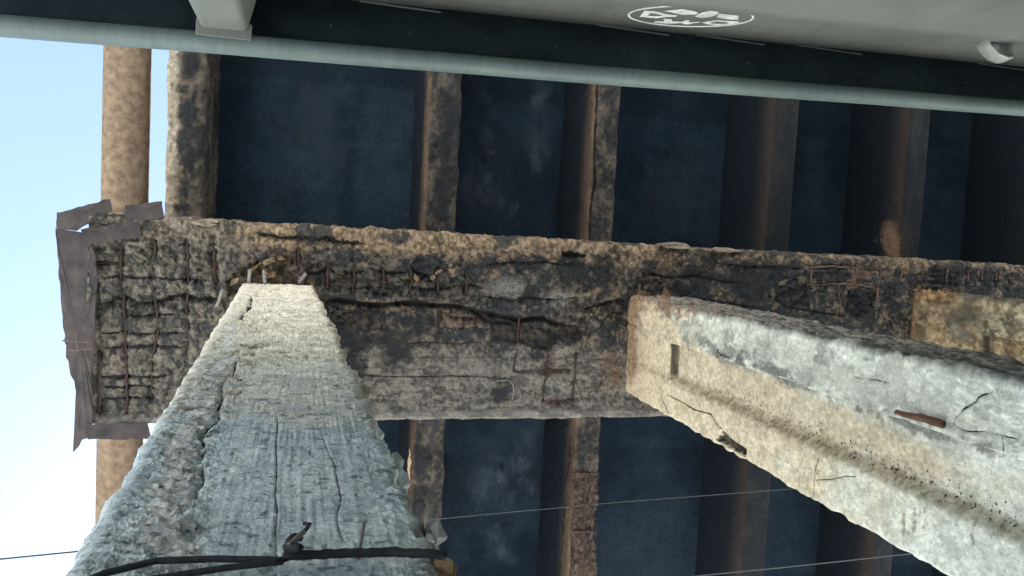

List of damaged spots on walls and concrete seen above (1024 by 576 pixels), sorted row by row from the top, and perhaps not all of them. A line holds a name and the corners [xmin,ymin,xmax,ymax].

damp [174,57,198,212]
damp [488,251,533,296]
spalling [561,250,587,258]
spalling [770,260,883,319]
spalling [914,269,954,302]
damp [326,310,436,379]
crack [195,364,236,500]
spalling [84,219,582,557]
damp [490,384,511,402]
crack [659,387,722,429]
crack [941,392,1017,451]
crack [272,418,280,569]